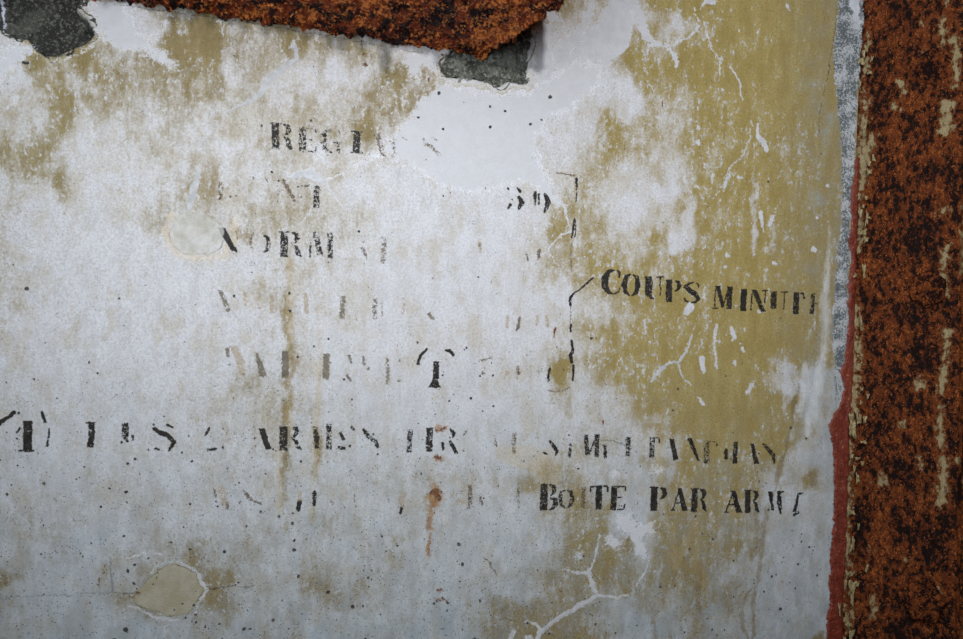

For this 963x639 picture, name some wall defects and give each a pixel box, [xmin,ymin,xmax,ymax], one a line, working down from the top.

spalling [0,0,181,111]
crack [700,0,744,100]
crack [722,128,751,192]
rust [426,483,443,555]
crack [499,534,651,639]